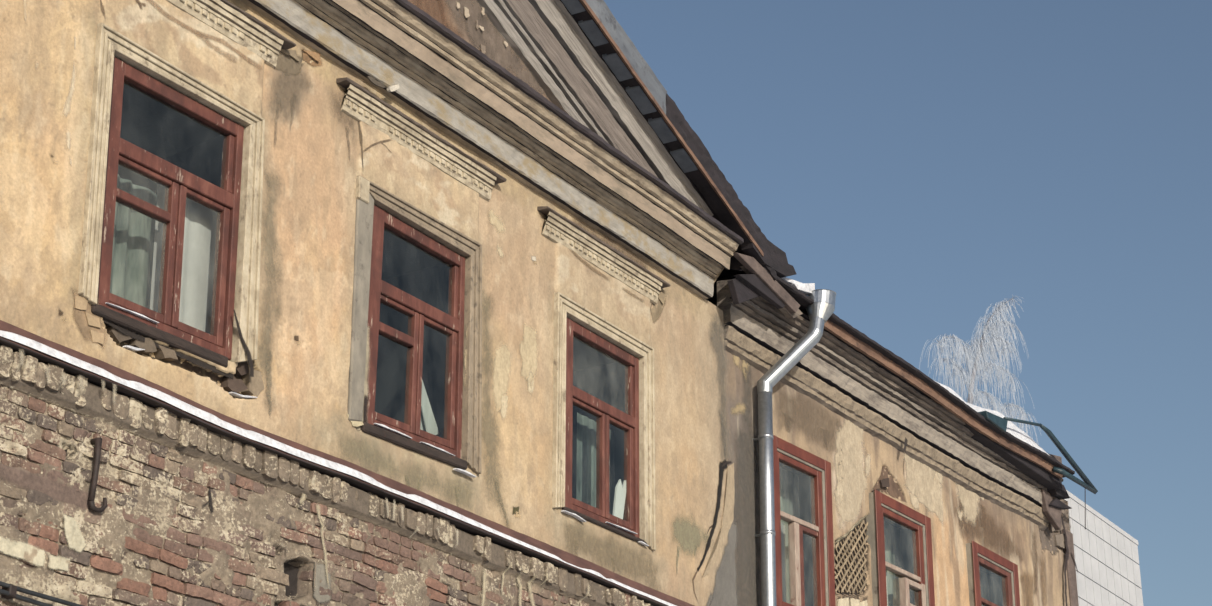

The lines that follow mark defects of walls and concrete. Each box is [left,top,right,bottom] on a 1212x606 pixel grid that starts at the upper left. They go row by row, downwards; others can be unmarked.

spalling [59,292,265,398]
spalling [347,327,370,430]
leakage [673,519,706,565]
crack [693,460,735,601]
leakage [706,322,761,606]
peeling [834,420,984,606]